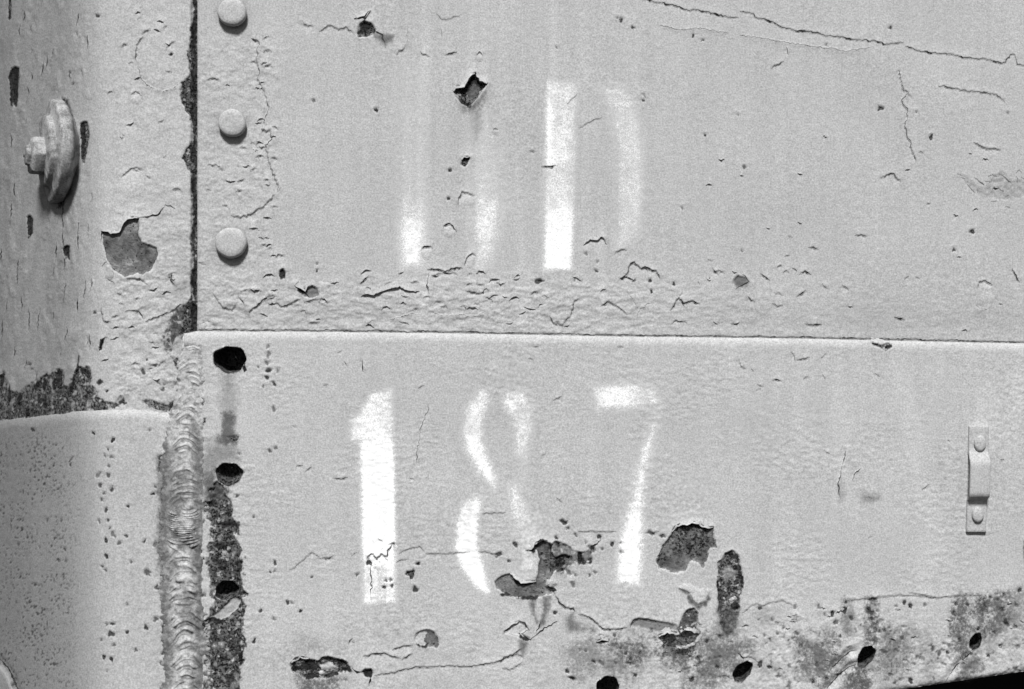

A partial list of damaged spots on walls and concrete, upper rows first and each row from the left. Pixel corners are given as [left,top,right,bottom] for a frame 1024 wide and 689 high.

peeling [354,6,391,43]
crack [649,0,1022,66]
peeling [451,70,488,107]
peeling [101,204,174,281]
crack [360,267,458,316]
crack [581,232,699,324]
peeling [495,519,614,599]
peeling [656,516,717,572]
spalling [202,591,249,626]
peeling [630,619,708,652]
peeling [289,652,338,674]
crack [349,639,521,682]